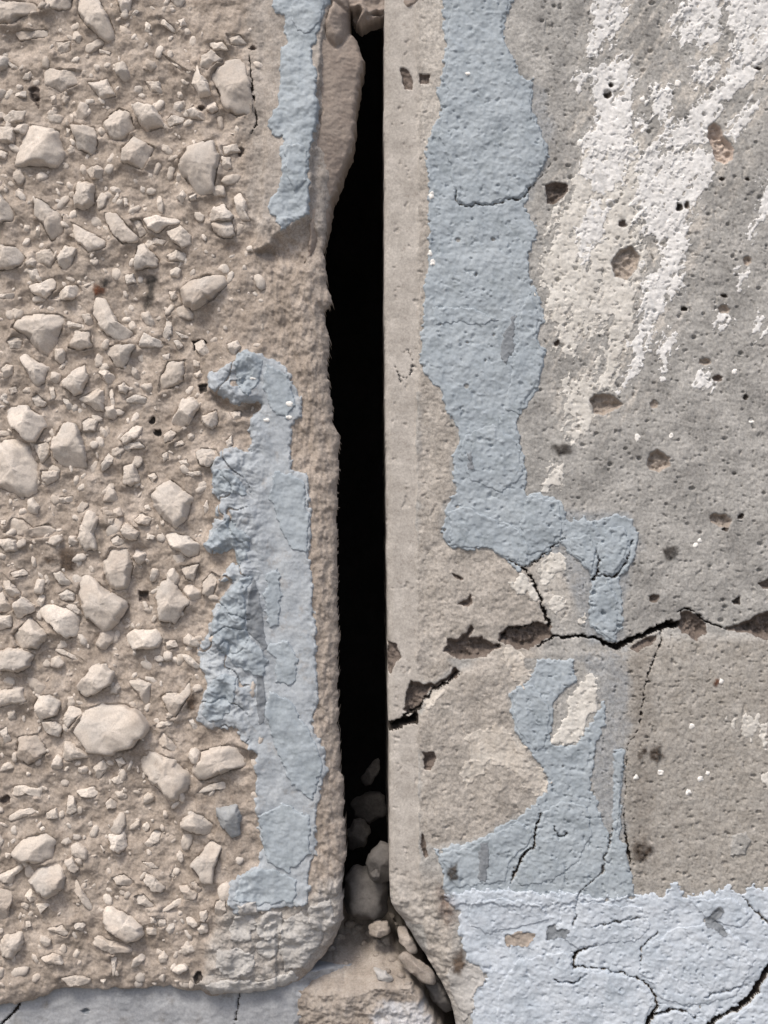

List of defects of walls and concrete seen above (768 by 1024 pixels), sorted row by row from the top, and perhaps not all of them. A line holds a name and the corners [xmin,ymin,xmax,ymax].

peeling [267,0,331,231]
water stain [553,444,572,455]
peeling [419,0,768,643]
peeling [196,349,336,995]
peeling [424,689,445,710]
crack [385,540,768,924]
peeling [433,647,768,1024]
crack [554,918,768,1024]